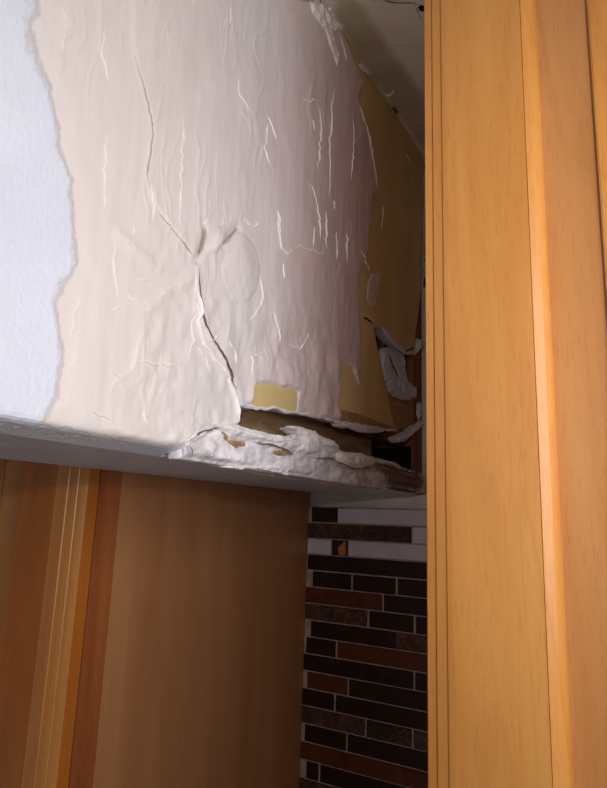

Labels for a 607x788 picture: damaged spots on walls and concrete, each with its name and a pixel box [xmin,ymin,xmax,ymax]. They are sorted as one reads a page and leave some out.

crack [135,58,154,188]
crack [159,213,242,425]
flaking render [168,423,426,493]
spalling [248,404,397,432]